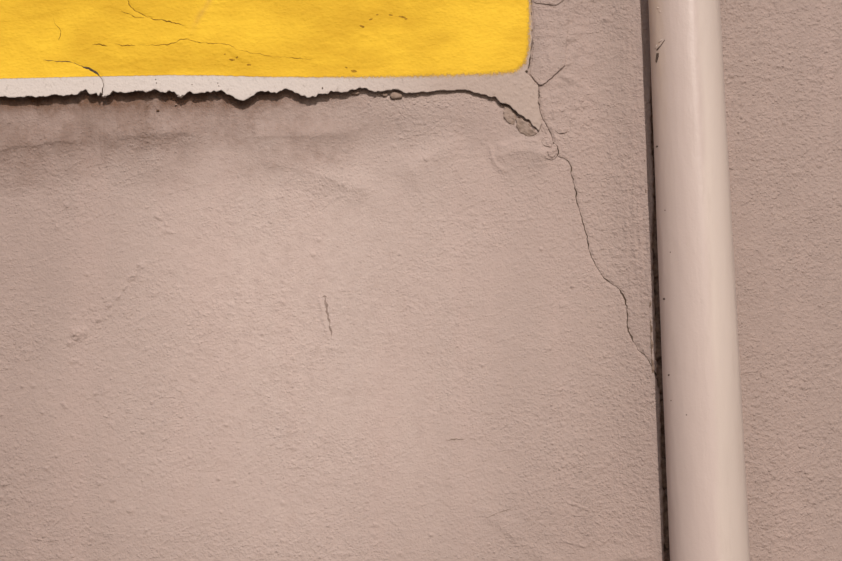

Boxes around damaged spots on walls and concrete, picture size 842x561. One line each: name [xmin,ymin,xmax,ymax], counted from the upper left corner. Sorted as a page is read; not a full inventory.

crack [95,1,302,59]
crack [46,60,104,96]
flaking render [381,92,403,100]
crack [538,85,658,381]